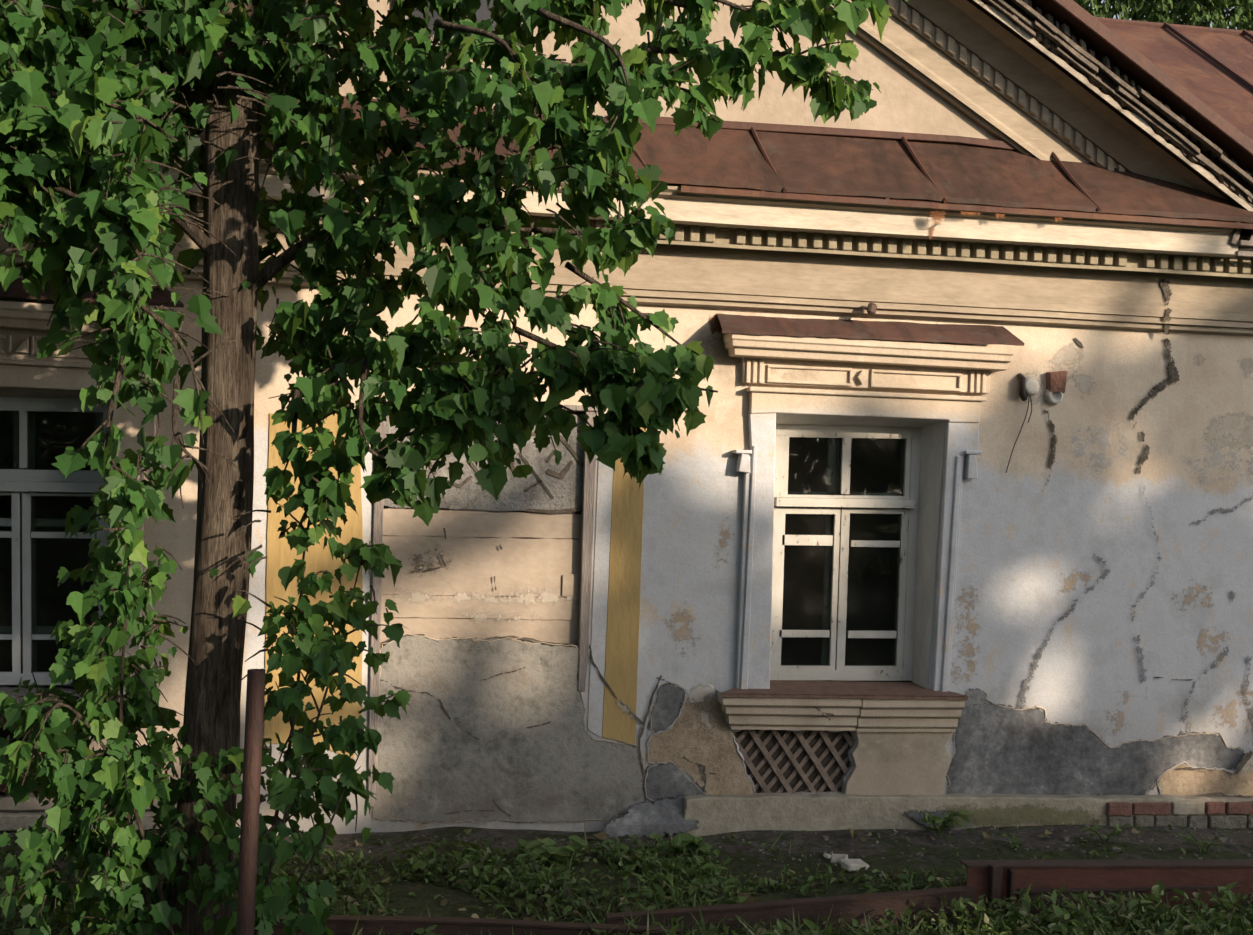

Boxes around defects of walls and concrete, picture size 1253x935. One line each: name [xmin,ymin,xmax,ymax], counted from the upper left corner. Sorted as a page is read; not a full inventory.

crack [1044,410,1058,484]
crack [1130,279,1253,731]
peeling [397,588,580,622]
crack [1018,554,1110,708]
flaking render [646,694,856,795]
crack [1183,751,1253,798]
peeling [1212,688,1253,733]